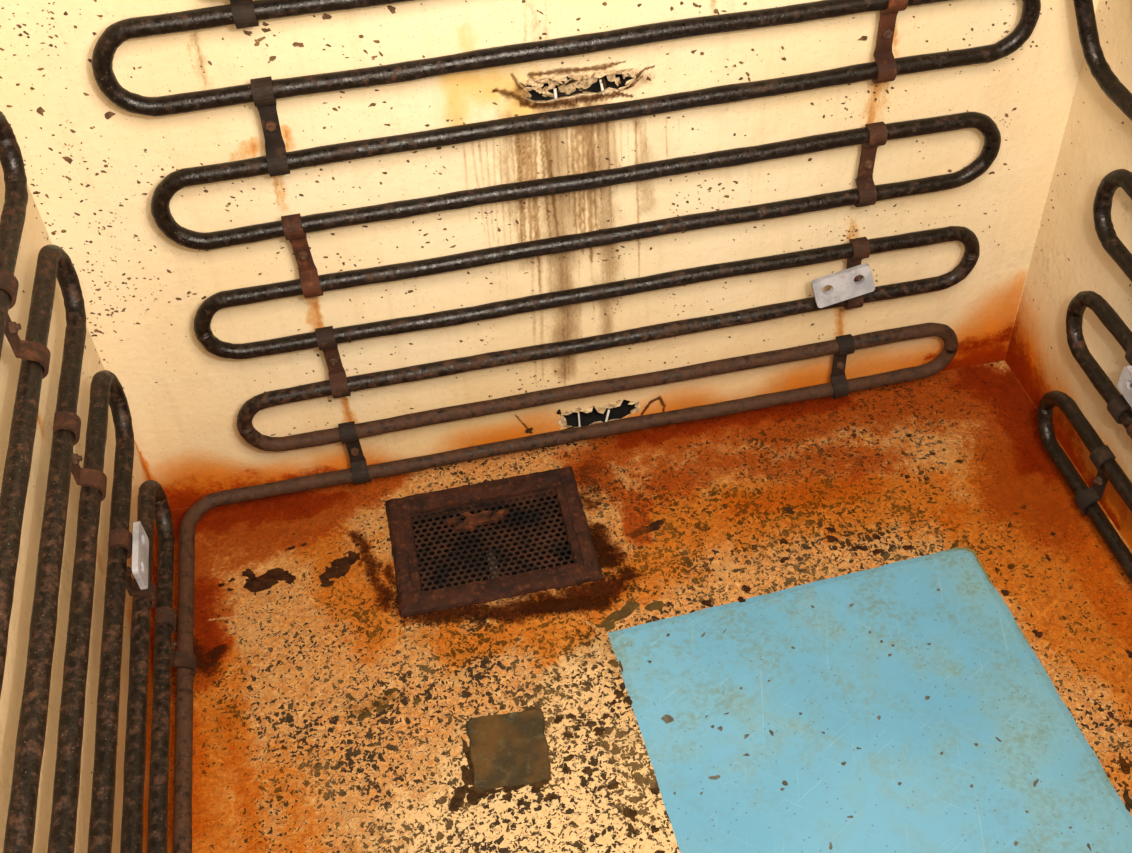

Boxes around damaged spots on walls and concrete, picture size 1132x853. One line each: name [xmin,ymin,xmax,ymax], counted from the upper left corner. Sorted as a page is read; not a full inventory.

peeling [0,2,81,95]
peeling [243,18,280,63]
spalling [479,46,671,116]
peeling [670,173,738,216]
peeling [24,106,206,364]
corrosion [940,338,1040,410]
spalling [557,397,665,429]
corrosion [170,493,344,537]
corrosion [446,509,509,532]
corrosion [350,524,636,623]
corrosion [193,590,230,672]